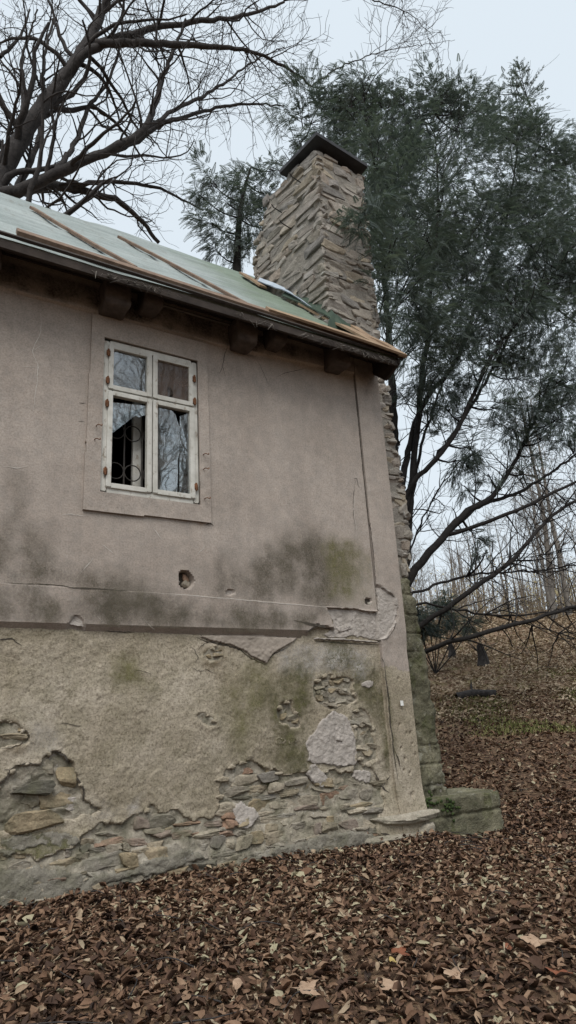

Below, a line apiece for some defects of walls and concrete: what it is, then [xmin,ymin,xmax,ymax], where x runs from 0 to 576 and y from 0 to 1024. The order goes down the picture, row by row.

crack [12,388,401,792]
leakage [256,541,331,603]
flaking render [314,587,398,643]
flaking render [0,673,388,910]